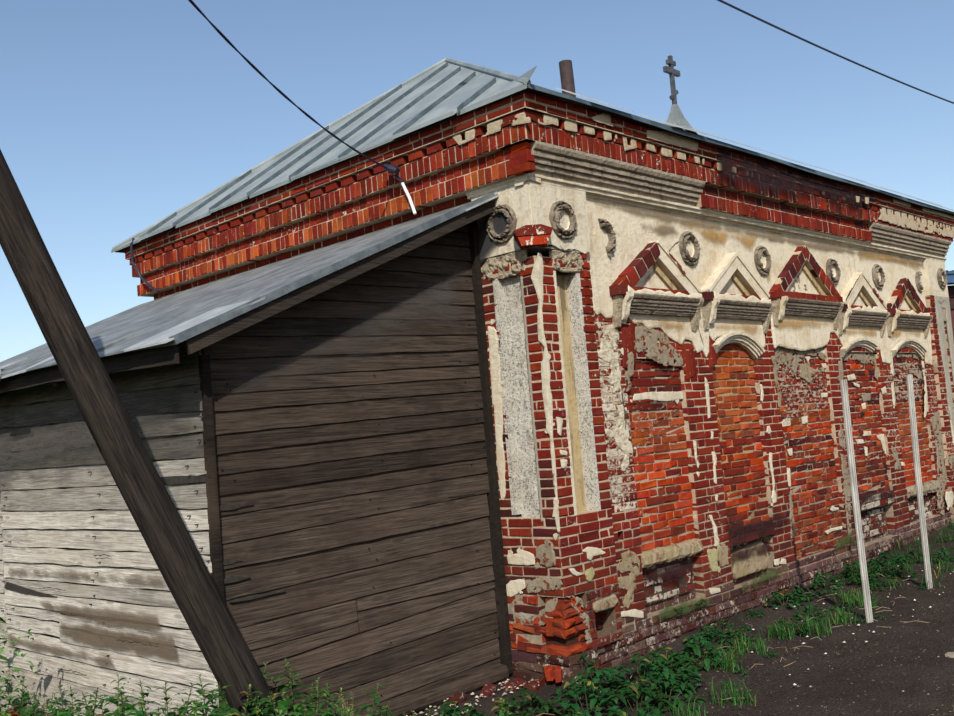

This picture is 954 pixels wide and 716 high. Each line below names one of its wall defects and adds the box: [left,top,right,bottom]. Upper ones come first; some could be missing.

leakage [702,230,755,248]
peeling [580,253,684,502]
spalling [766,350,828,434]
peeling [908,491,954,526]
spalling [506,547,605,683]
peeling [621,573,644,618]